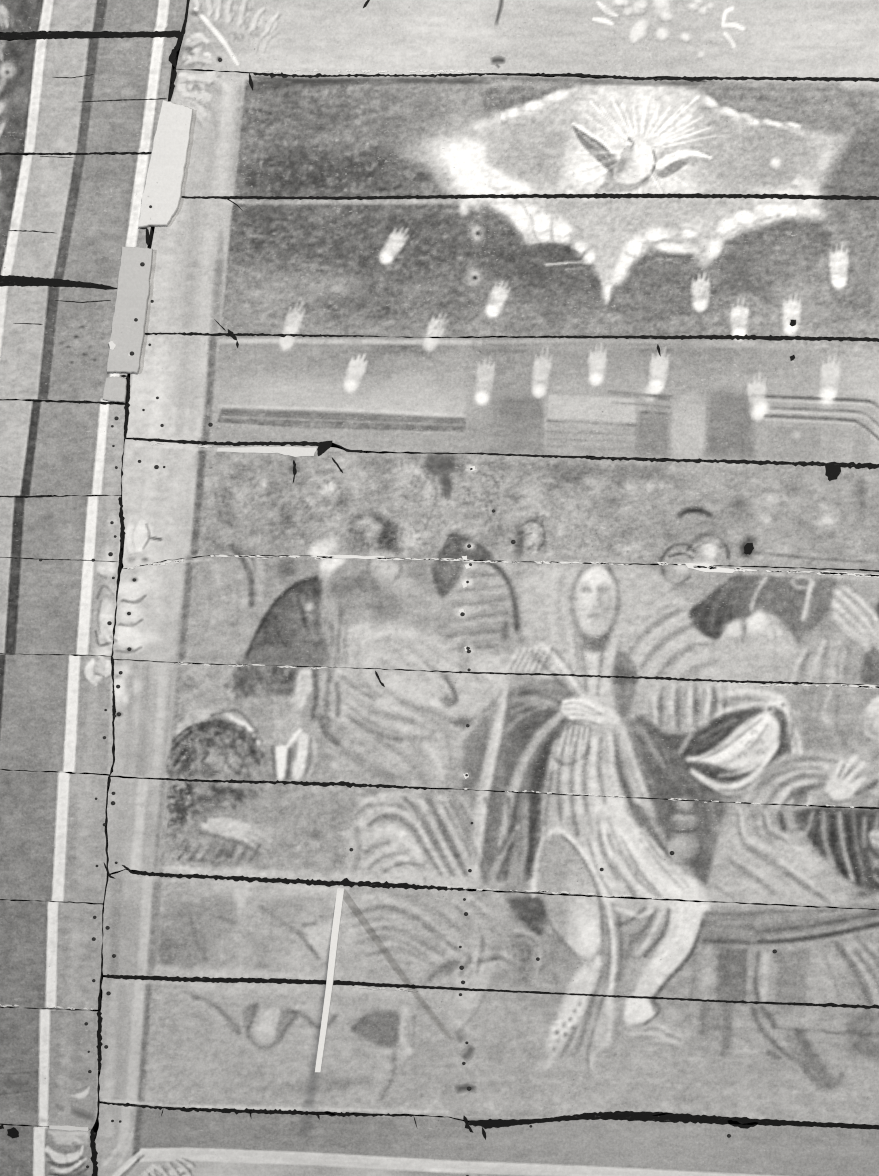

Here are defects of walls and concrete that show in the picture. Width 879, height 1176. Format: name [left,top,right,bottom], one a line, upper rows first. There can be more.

crack [0,0,190,102]
crack [249,72,879,90]
crack [183,193,879,211]
crack [0,275,117,325]
crack [509,334,879,356]
crack [31,375,364,483]
crack [475,453,879,470]
crack [458,671,811,685]
crack [104,863,469,891]
crack [105,974,879,1009]
crack [90,1102,417,1176]
crack [463,1111,879,1140]